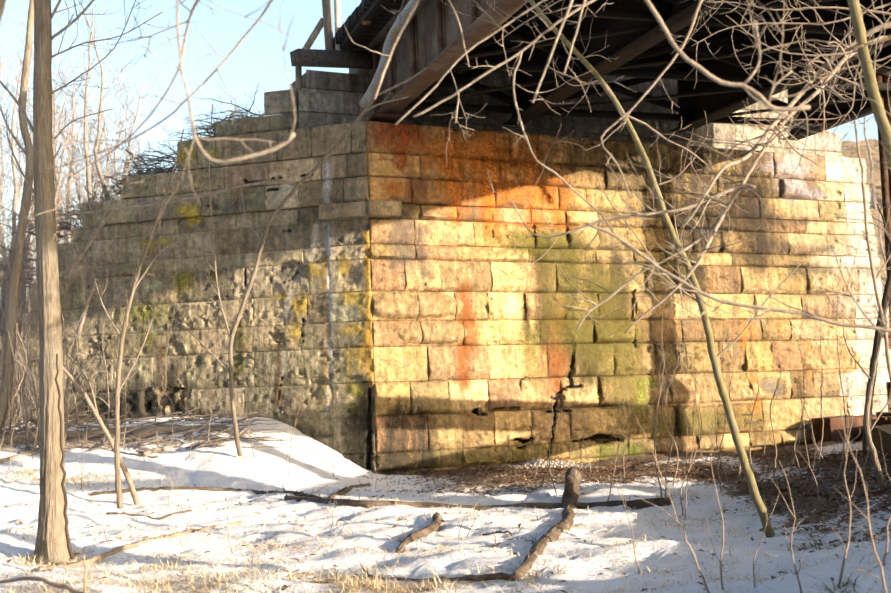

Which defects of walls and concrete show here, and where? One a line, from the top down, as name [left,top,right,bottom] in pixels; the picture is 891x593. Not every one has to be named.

corrosion [439,130,573,237]
efflorescence [324,234,333,389]
corrosion [457,285,477,389]
water stain [511,232,640,411]
crack [492,404,520,412]
crack [544,344,582,461]